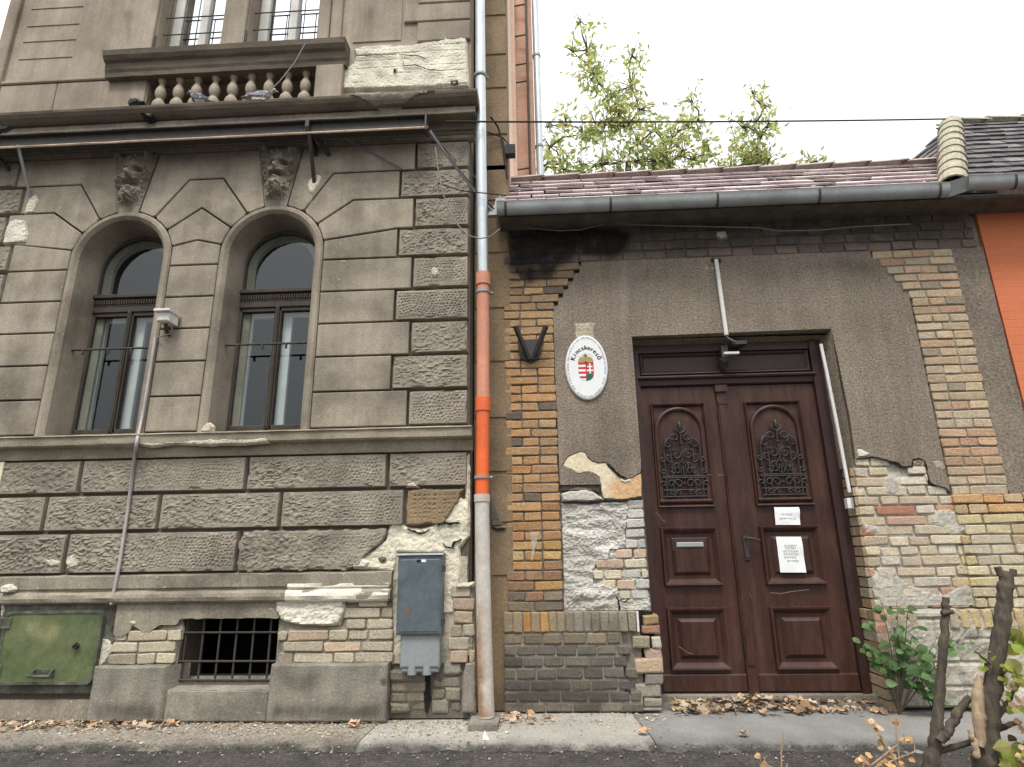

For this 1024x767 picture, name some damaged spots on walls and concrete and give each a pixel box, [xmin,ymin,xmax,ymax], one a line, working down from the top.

flaking render [99,621,185,665]
flaking render [276,601,394,664]
flaking render [353,453,477,713]
flaking render [560,451,663,711]
flaking render [842,449,1024,712]